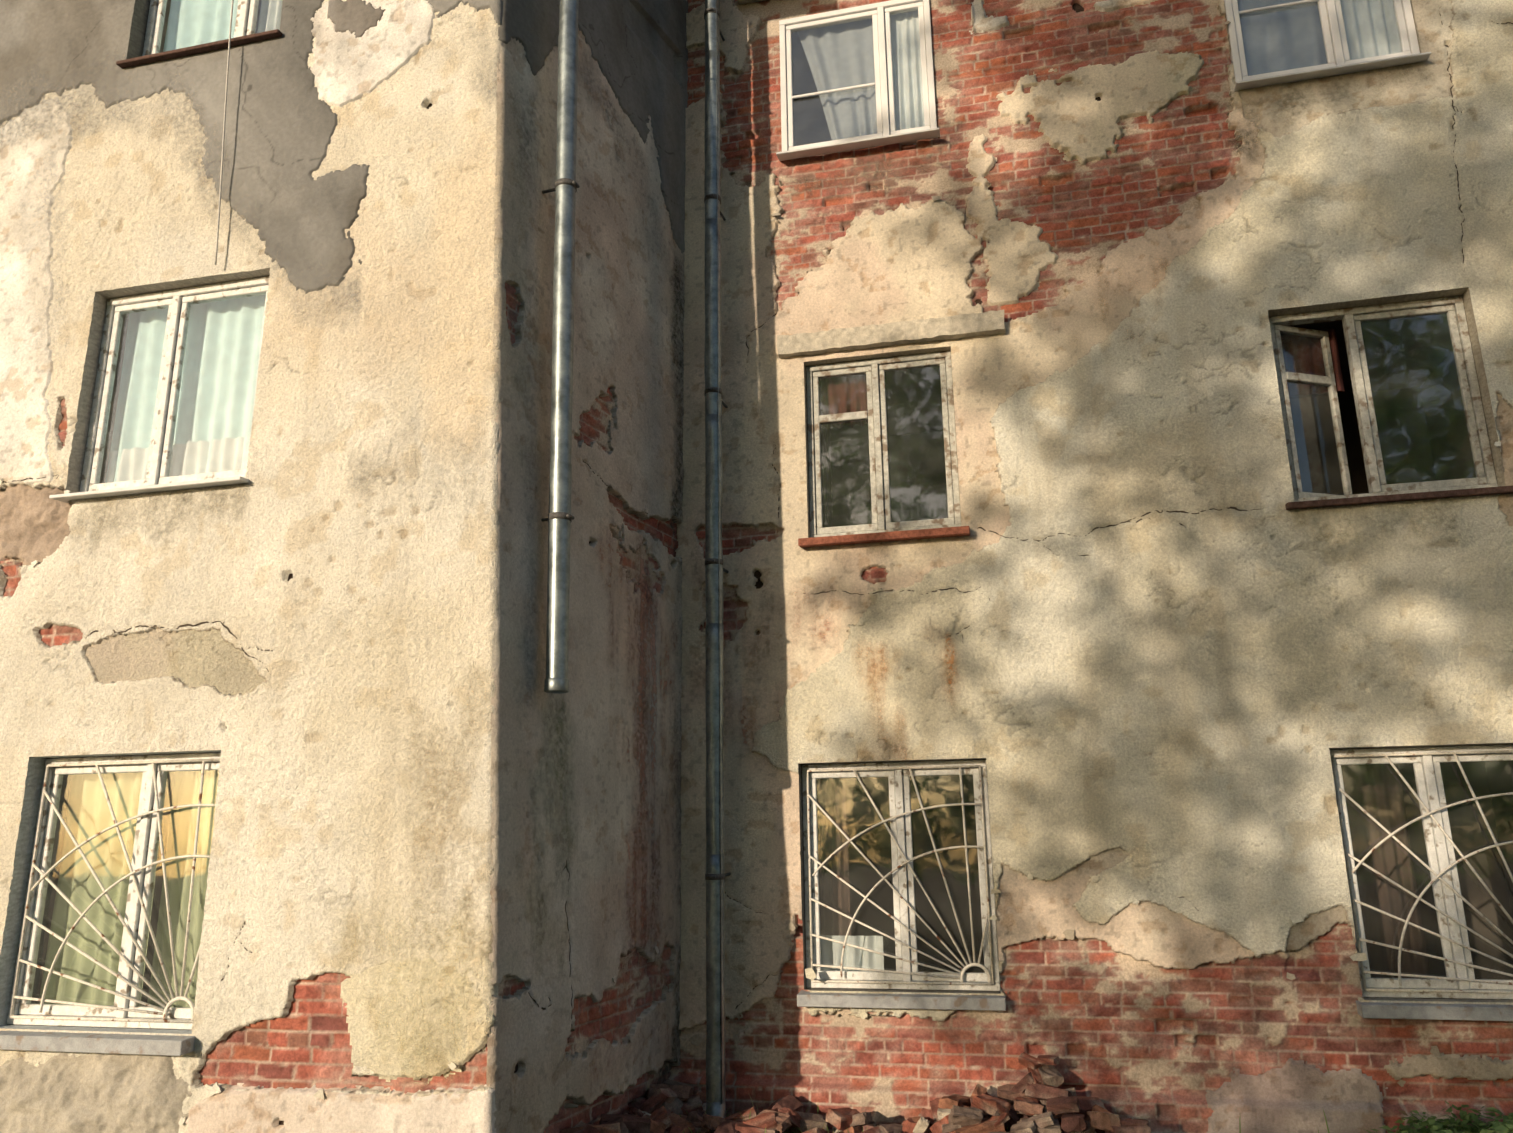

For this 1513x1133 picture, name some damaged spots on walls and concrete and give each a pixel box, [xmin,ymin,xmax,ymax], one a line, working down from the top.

peeling [310,0,435,108]
crack [1439,12,1465,270]
peeling [0,97,74,597]
spalling [505,283,521,344]
peeling [544,0,1513,1133]
peeling [38,624,266,696]
spalling [178,973,497,1133]
spalling [498,976,525,998]